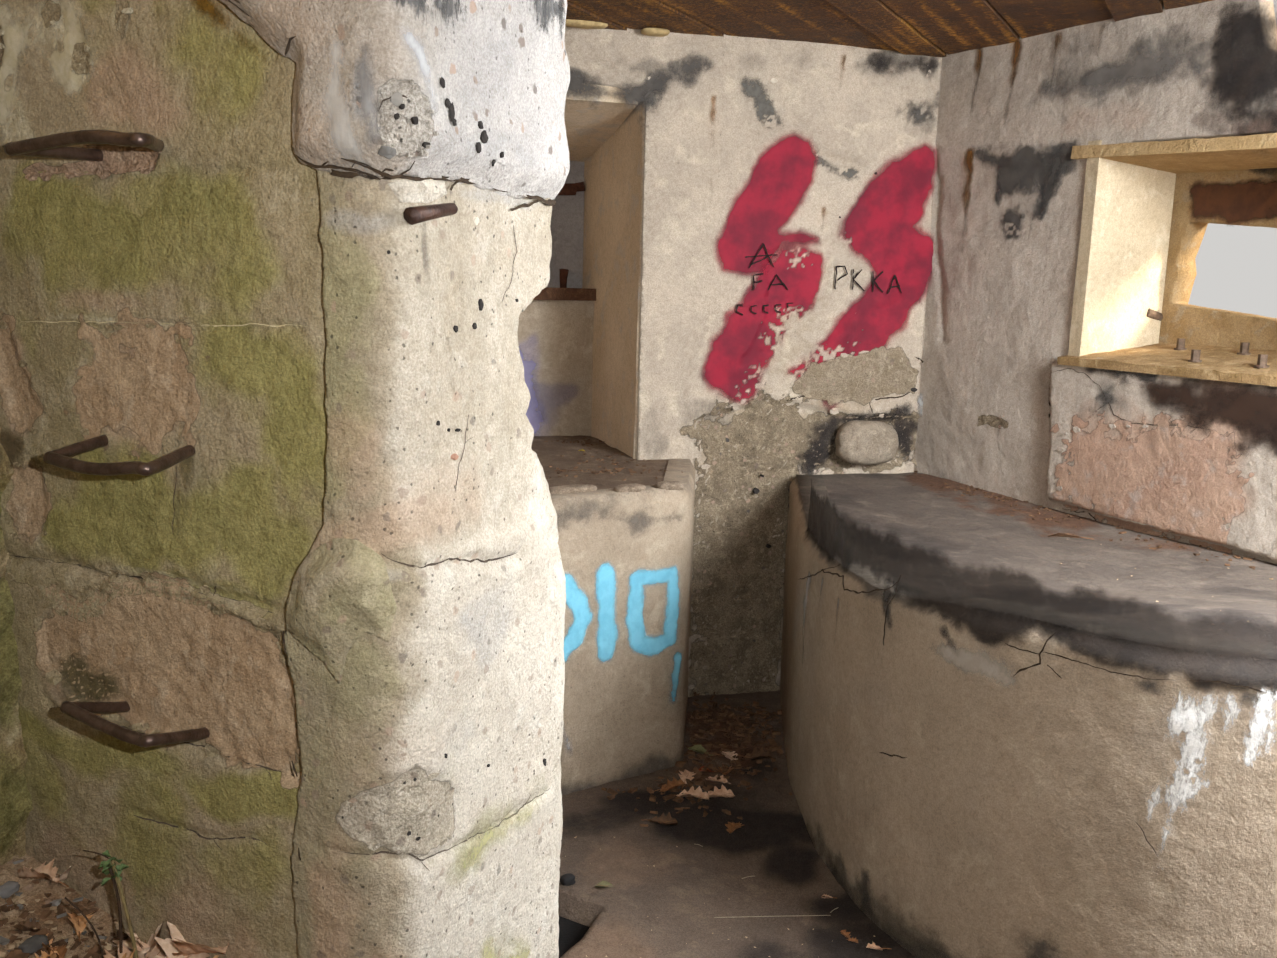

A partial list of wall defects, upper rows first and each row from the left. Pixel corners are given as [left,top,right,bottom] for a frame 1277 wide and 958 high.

damp [327,47,360,158]
damp [406,34,429,76]
damp [393,0,467,26]
damp [534,0,564,38]
damp [975,142,1076,239]
spalling [680,346,922,697]
peeling [1050,411,1254,554]
crack [1005,631,1267,693]
damp [1148,689,1277,848]